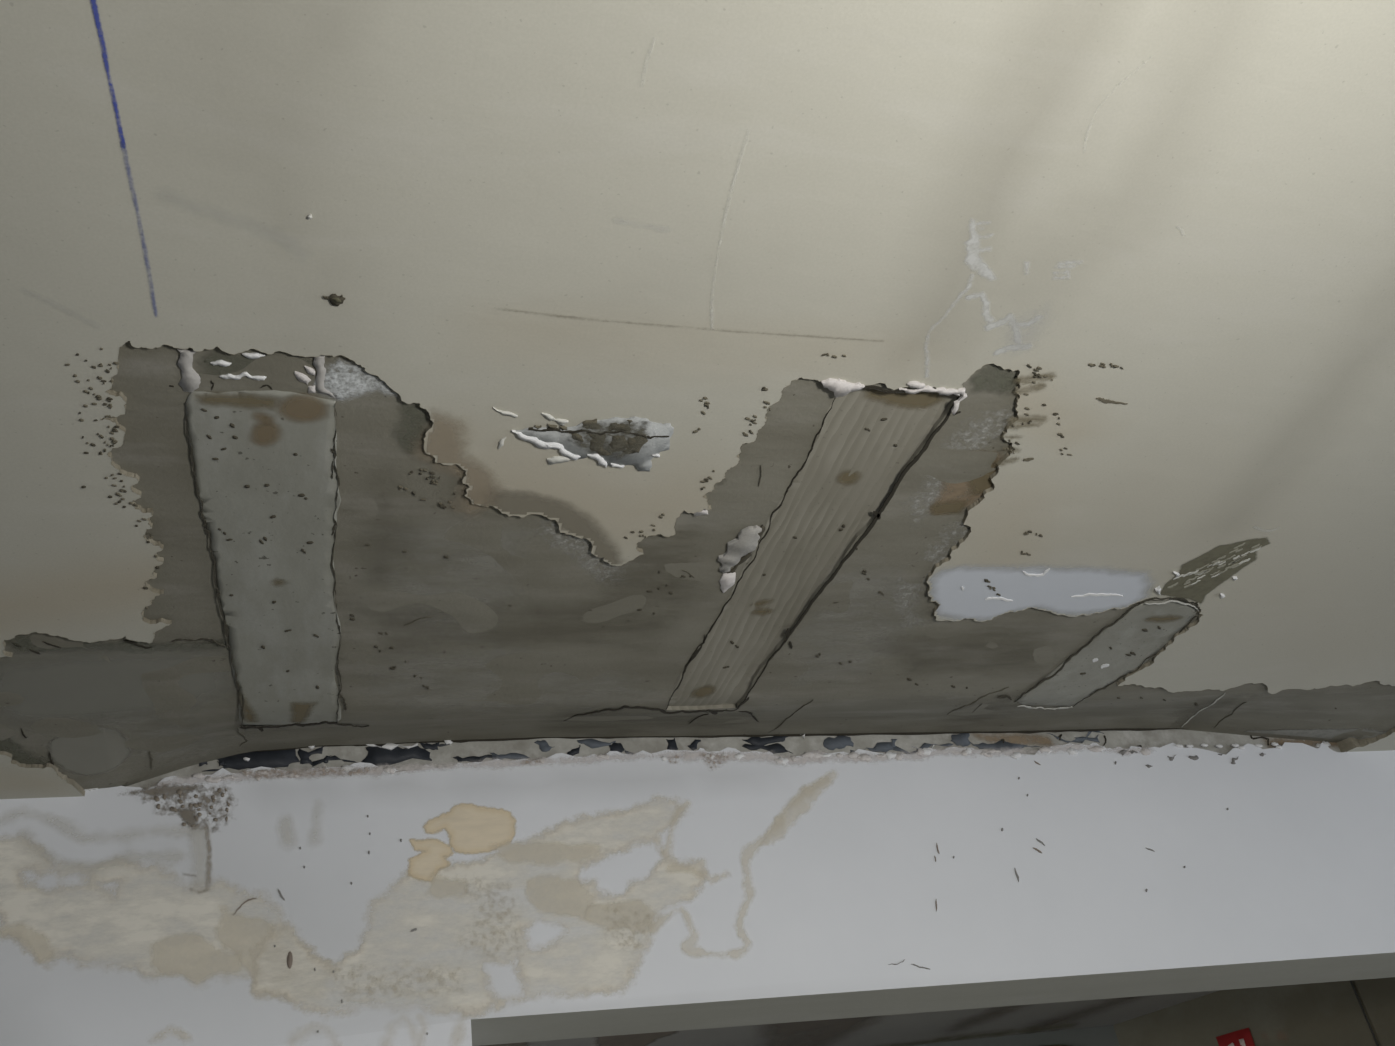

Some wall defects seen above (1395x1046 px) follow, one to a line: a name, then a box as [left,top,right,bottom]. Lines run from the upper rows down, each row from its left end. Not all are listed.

crack [13,641,61,655]
crack [124,375,1201,752]
spalling [0,341,1395,796]
leakage [0,784,706,1016]